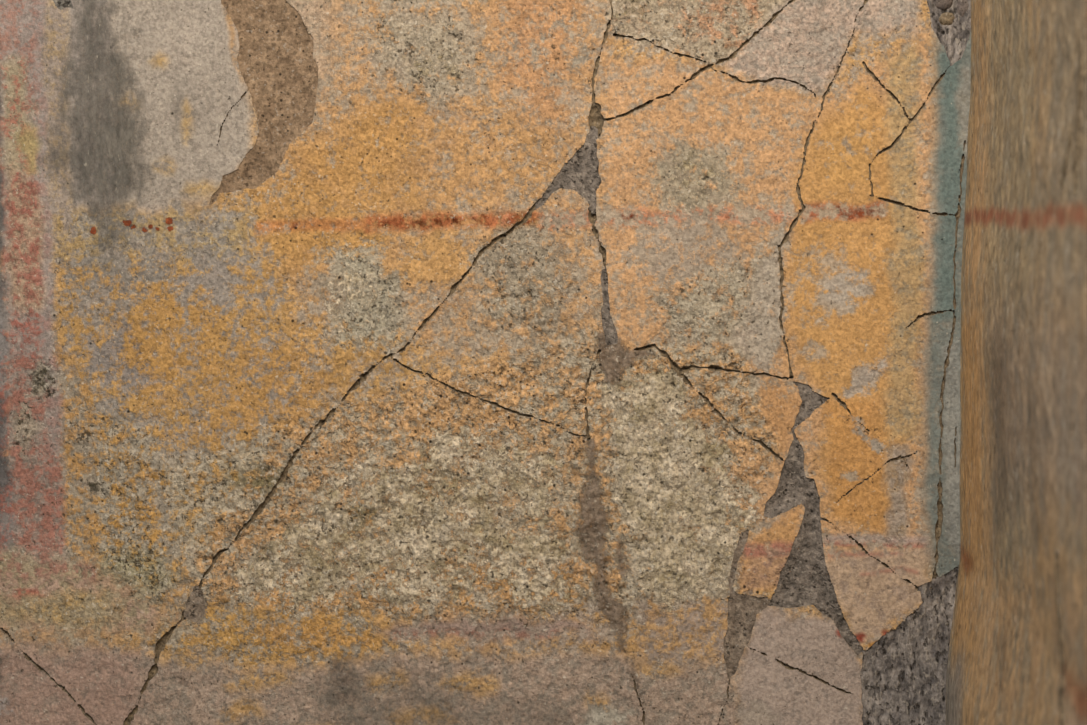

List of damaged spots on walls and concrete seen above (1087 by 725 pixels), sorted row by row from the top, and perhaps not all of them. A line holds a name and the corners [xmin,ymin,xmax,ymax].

damp [52,0,143,216]
flaking render [210,0,318,205]
corrosion [122,217,173,232]
crack [588,0,966,591]
crack [198,199,601,588]
crack [2,628,94,722]
crack [124,611,186,725]
crack [630,673,645,725]
crack [750,648,851,693]